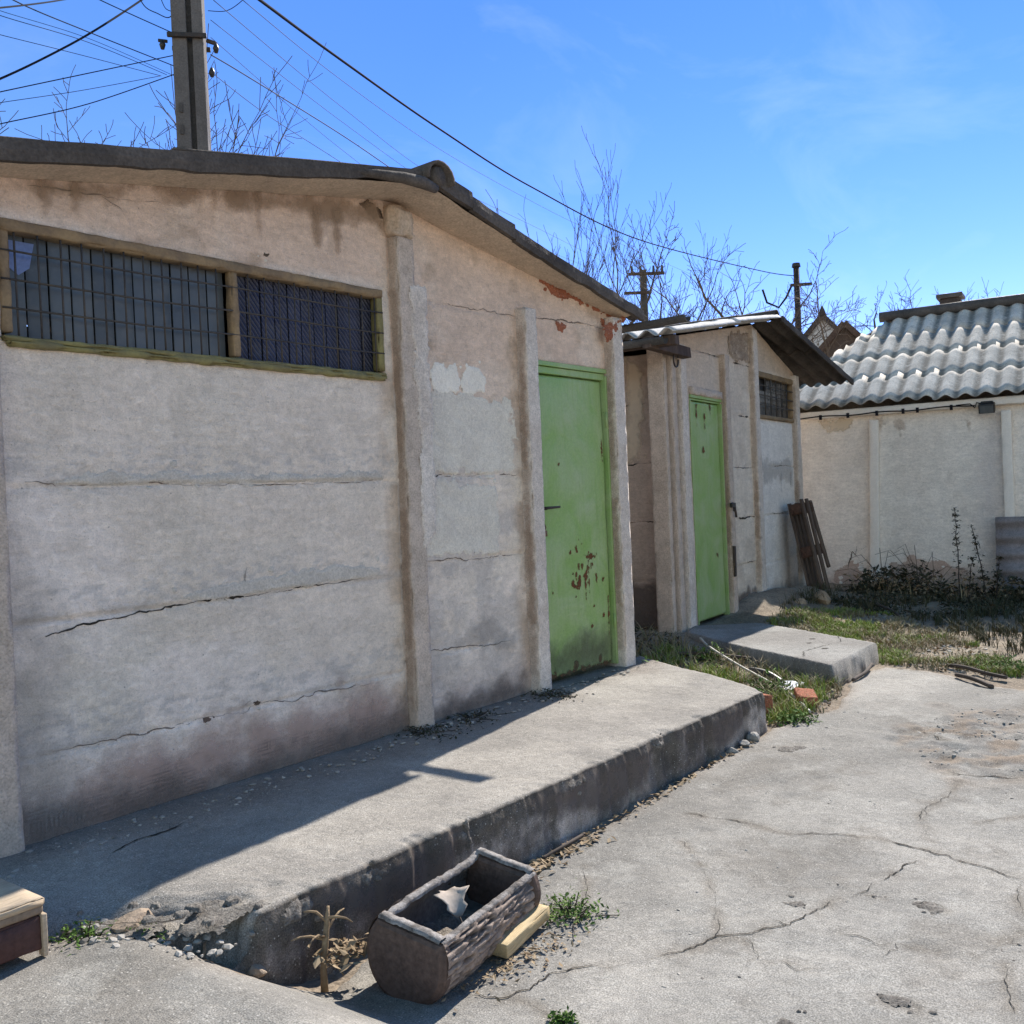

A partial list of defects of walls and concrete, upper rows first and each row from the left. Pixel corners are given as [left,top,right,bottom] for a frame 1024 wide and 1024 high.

water stain [214,190,382,248]
spalling [539,279,626,343]
peeling [409,284,519,558]
crack [45,568,358,637]
corrosion [569,539,610,634]
crack [45,683,373,755]
crack [114,820,188,852]